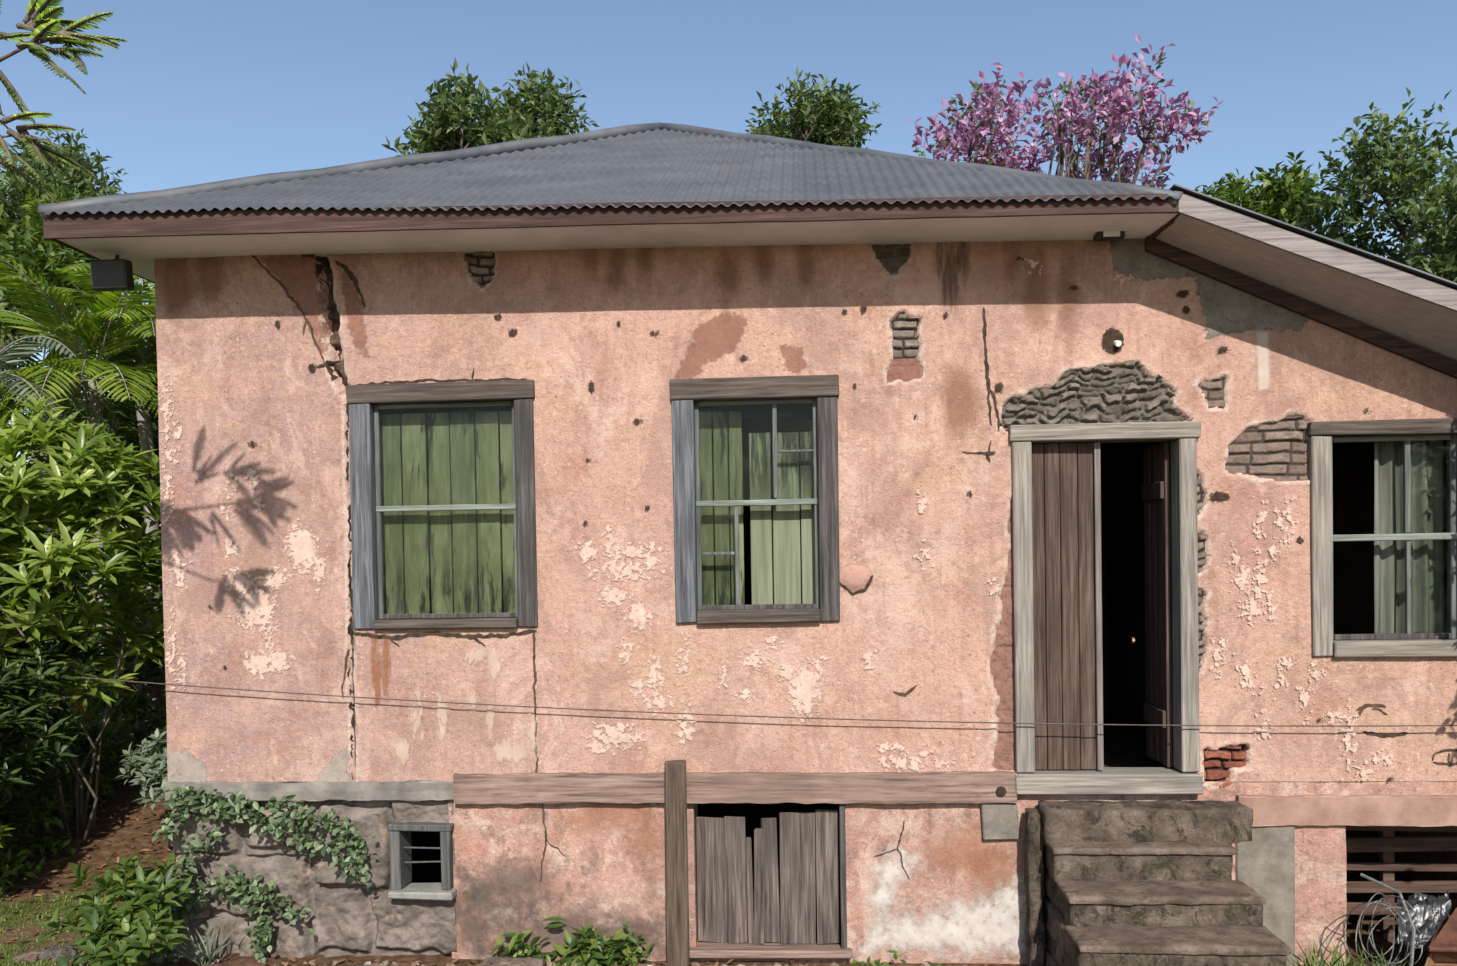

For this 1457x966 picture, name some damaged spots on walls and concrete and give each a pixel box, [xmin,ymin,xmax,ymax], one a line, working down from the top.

flaking render [464,251,495,288]
flaking render [887,312,923,383]
crack [963,307,1000,462]
flaking render [995,361,1187,431]
peeling [208,465,328,681]
crack [251,254,566,881]
peeling [573,520,696,760]
flaking render [1197,474,1230,516]
flaking render [1225,415,1310,627]
peeling [1198,534,1403,788]
crack [874,820,910,880]
water stain [860,850,1026,956]